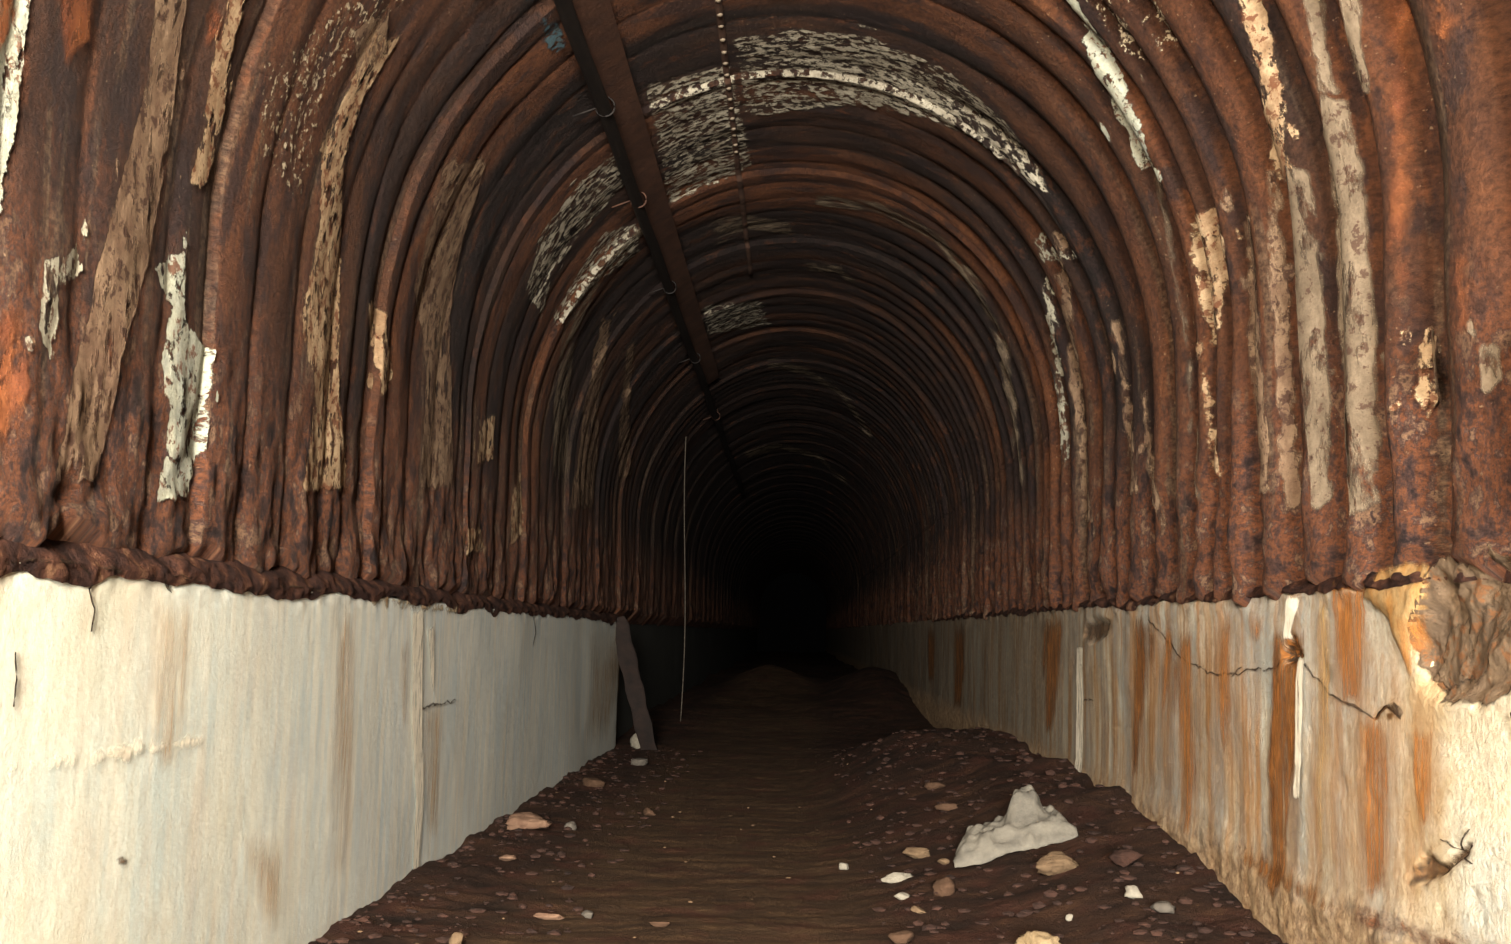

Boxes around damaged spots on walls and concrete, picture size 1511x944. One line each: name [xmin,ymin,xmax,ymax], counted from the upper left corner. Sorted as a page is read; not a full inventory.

peeling [0,0,30,213]
rust [61,0,91,56]
peeling [647,25,1047,202]
peeling [1067,0,1178,189]
peeling [25,0,219,502]
peeling [1165,0,1440,515]
rust [0,314,29,439]
rust [1134,619,1194,830]
crack [1149,621,1401,719]
rust [1244,634,1323,908]
rust [1319,589,1365,843]
spalling [1408,543,1511,706]